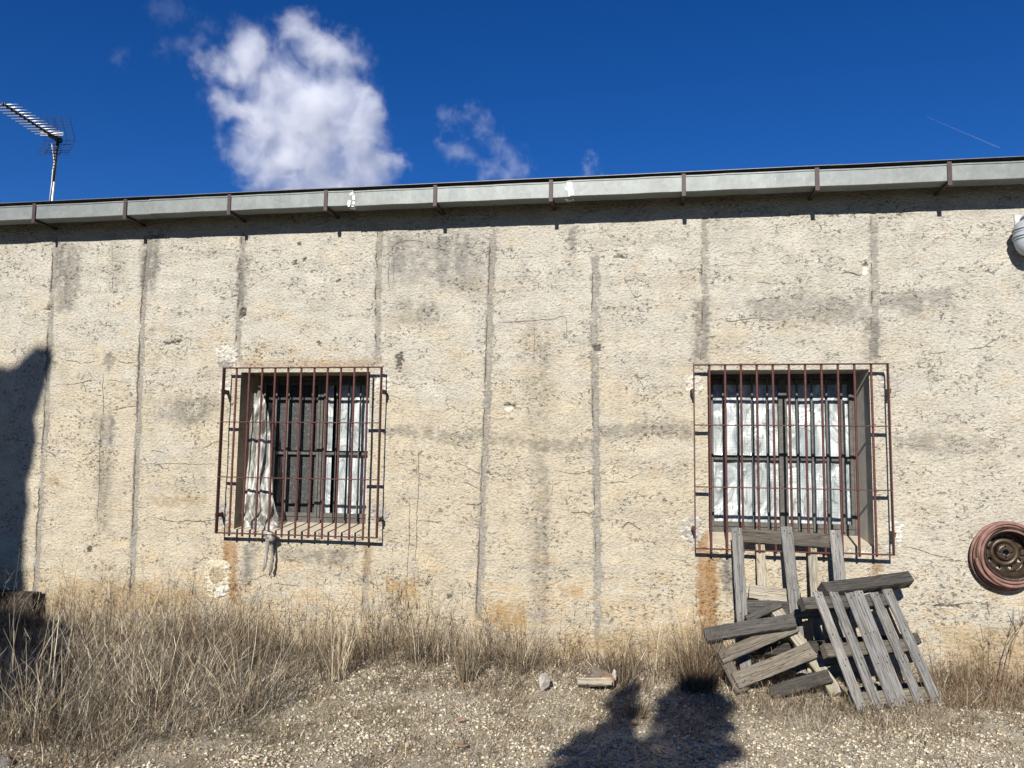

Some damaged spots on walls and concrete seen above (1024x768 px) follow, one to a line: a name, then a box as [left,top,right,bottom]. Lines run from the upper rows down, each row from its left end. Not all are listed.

flaking render [203,559,232,602]
rust [697,536,718,627]